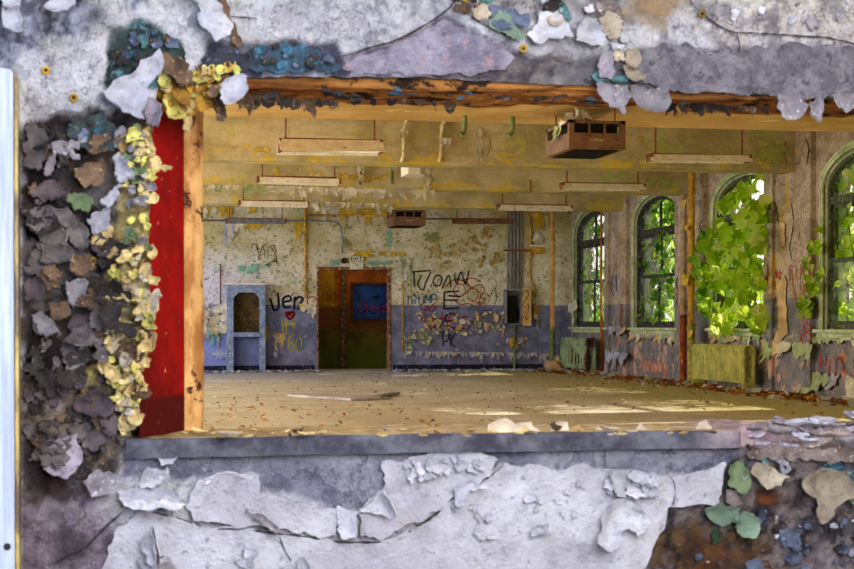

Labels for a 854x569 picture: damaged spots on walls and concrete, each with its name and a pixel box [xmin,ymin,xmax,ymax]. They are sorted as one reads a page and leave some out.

peeling [1,0,24,32]
crack [339,2,519,57]
peeling [453,0,854,123]
peeling [19,0,513,479]
peeling [402,311,549,362]
peeling [568,299,577,325]
peeling [605,325,674,377]
peeling [82,410,854,569]
crack [150,510,441,565]